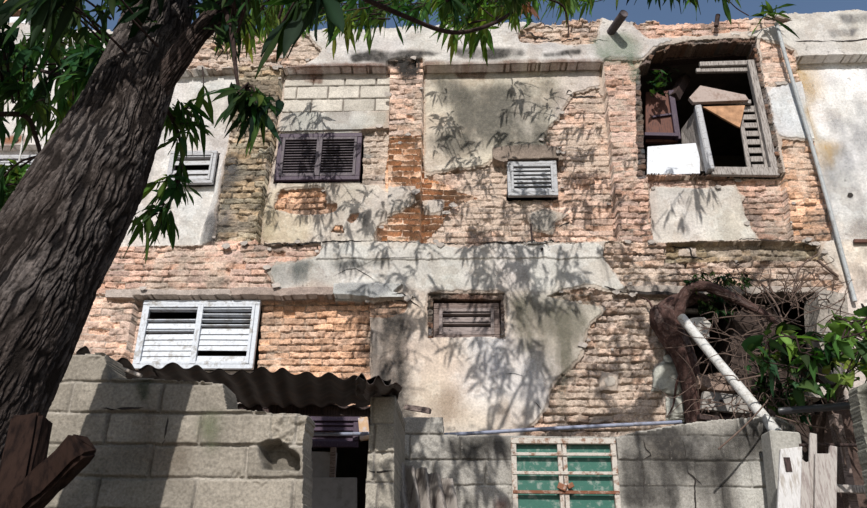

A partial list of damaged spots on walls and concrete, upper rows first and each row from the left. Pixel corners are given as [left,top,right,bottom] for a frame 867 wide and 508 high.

water stain [437,80,547,152]
flaking render [73,34,337,371]
flaking render [361,17,844,448]
water stain [369,310,408,412]
water stain [516,302,586,382]